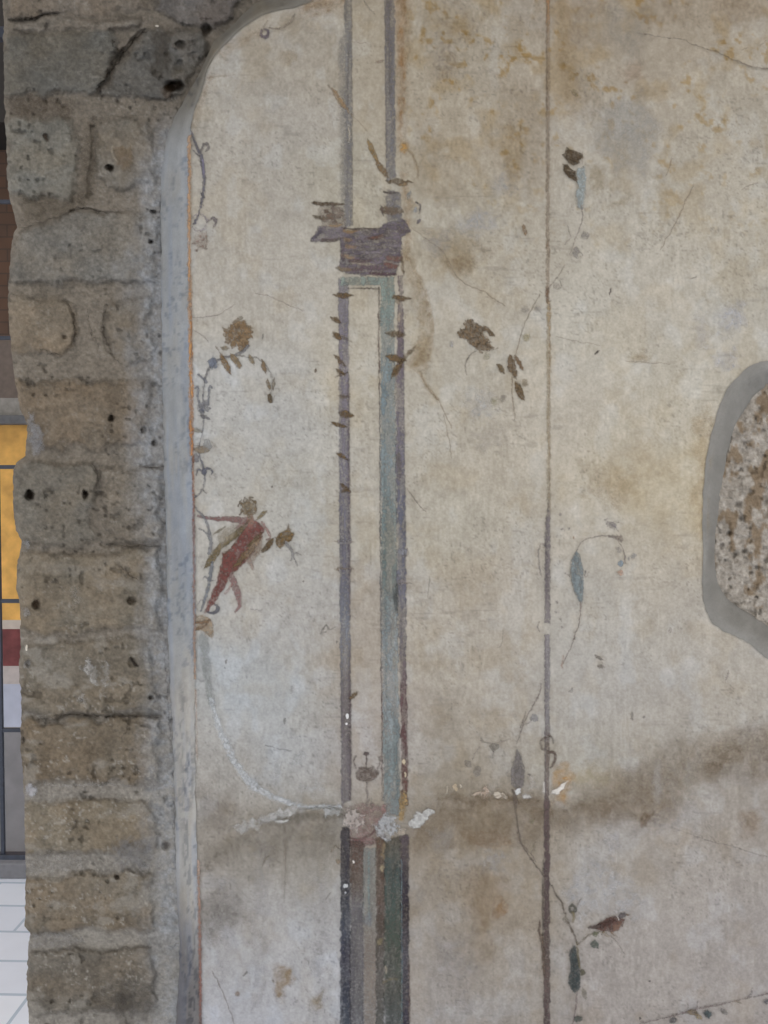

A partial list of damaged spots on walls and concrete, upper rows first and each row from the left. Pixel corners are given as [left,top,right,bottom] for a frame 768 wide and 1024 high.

peeling [240,806,295,833]
peeling [343,809,434,841]